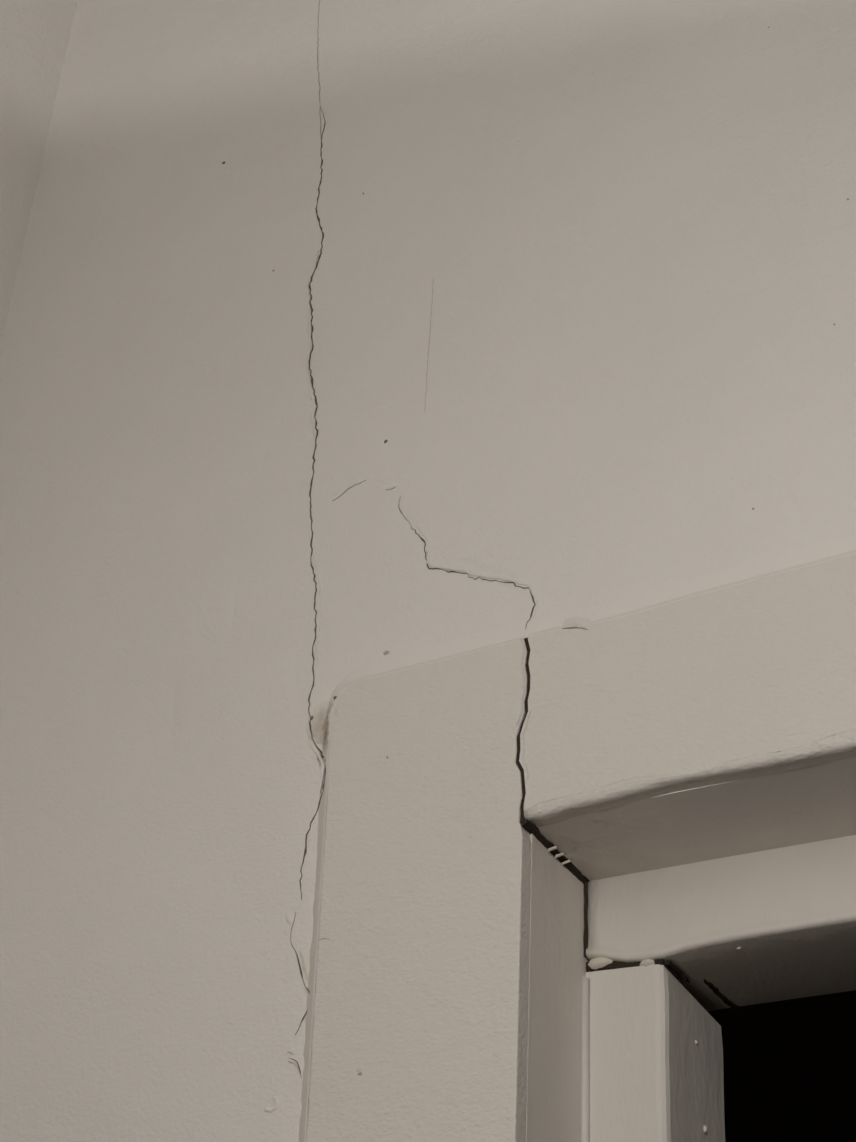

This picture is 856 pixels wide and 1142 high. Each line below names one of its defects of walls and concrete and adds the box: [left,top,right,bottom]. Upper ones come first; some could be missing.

crack [285,0,326,1075]
crack [398,496,741,1010]